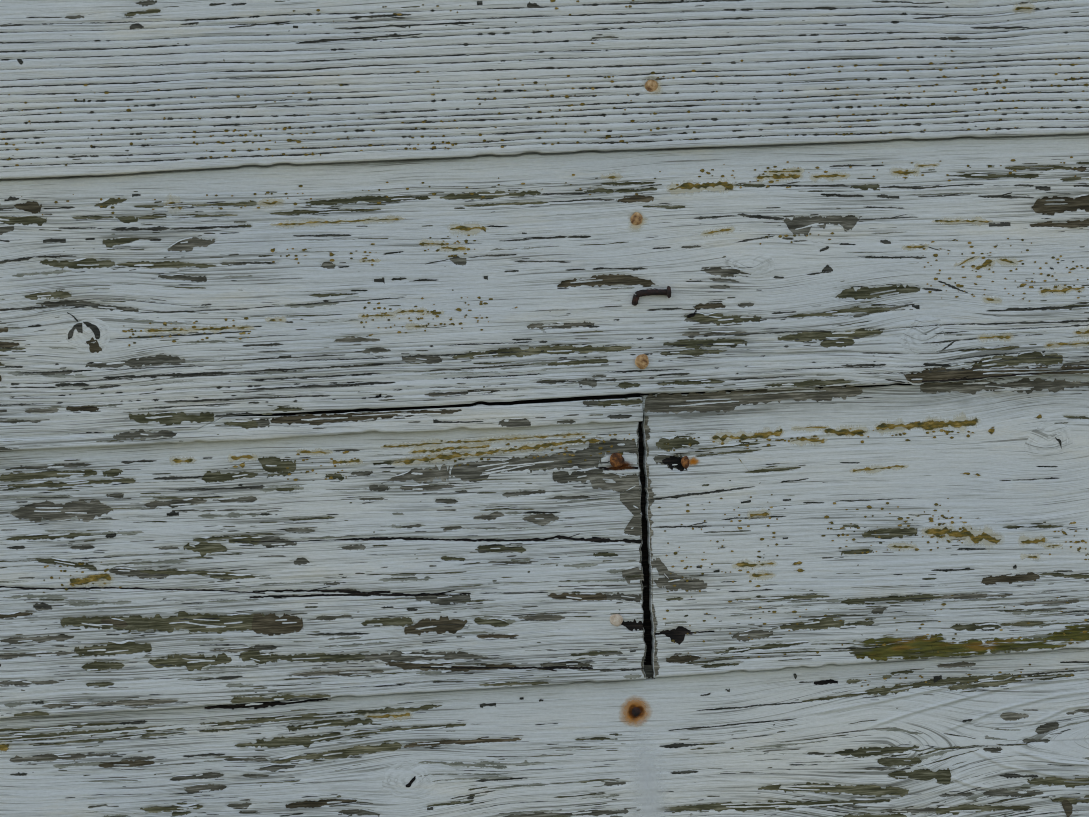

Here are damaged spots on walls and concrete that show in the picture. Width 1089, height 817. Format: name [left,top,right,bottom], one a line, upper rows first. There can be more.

crack [0,0,1089,167]
crack [766,164,1089,259]
crack [0,277,1089,434]
peeling [0,463,136,541]
crack [251,516,785,544]
peeling [387,379,863,678]
peeling [0,611,549,686]
peeling [316,593,565,639]
crack [621,619,714,645]
peeling [0,699,521,772]
corrosion [623,700,647,724]
peeling [657,745,1089,817]